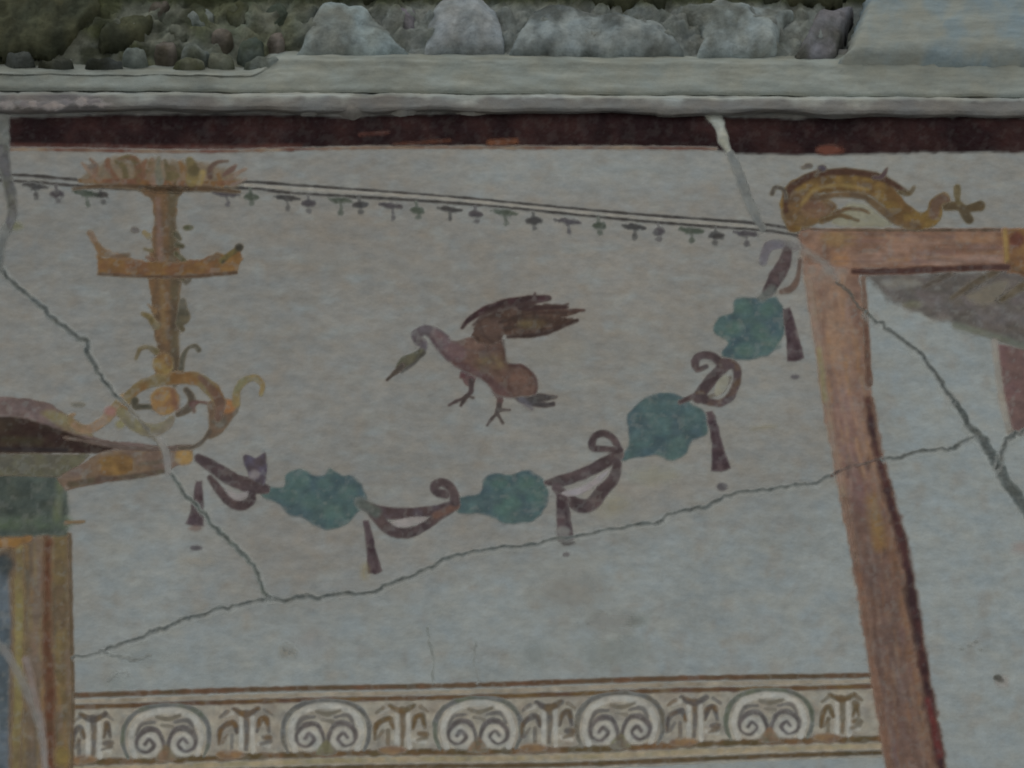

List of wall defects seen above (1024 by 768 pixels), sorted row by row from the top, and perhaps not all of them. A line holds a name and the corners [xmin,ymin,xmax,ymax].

crack [0,114,1024,681]